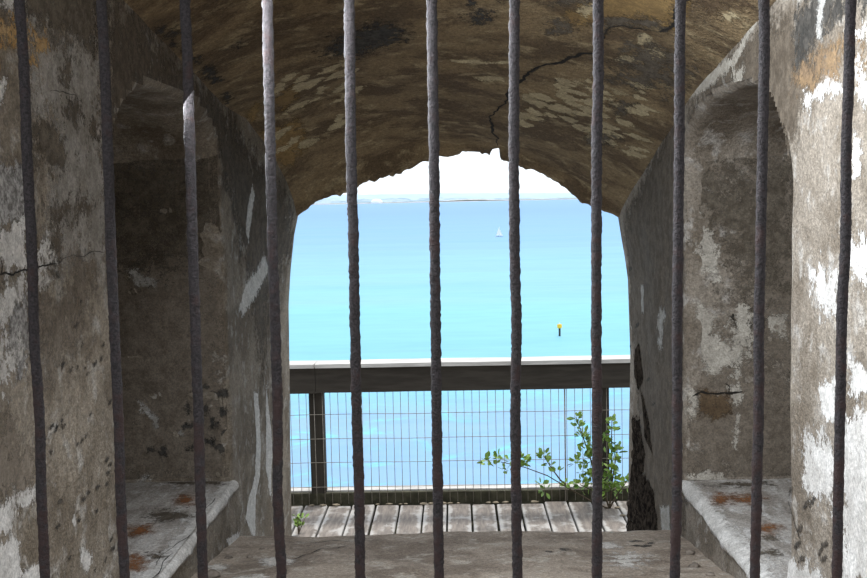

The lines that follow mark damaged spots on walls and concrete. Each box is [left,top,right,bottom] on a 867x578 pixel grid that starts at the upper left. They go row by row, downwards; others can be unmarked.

crack [488,0,689,146]
leakage [603,15,759,124]
crack [0,251,104,290]
leakage [624,125,687,537]
leakage [687,0,845,488]
peeling [804,248,839,329]
peeling [850,226,867,293]
peeling [787,351,867,578]